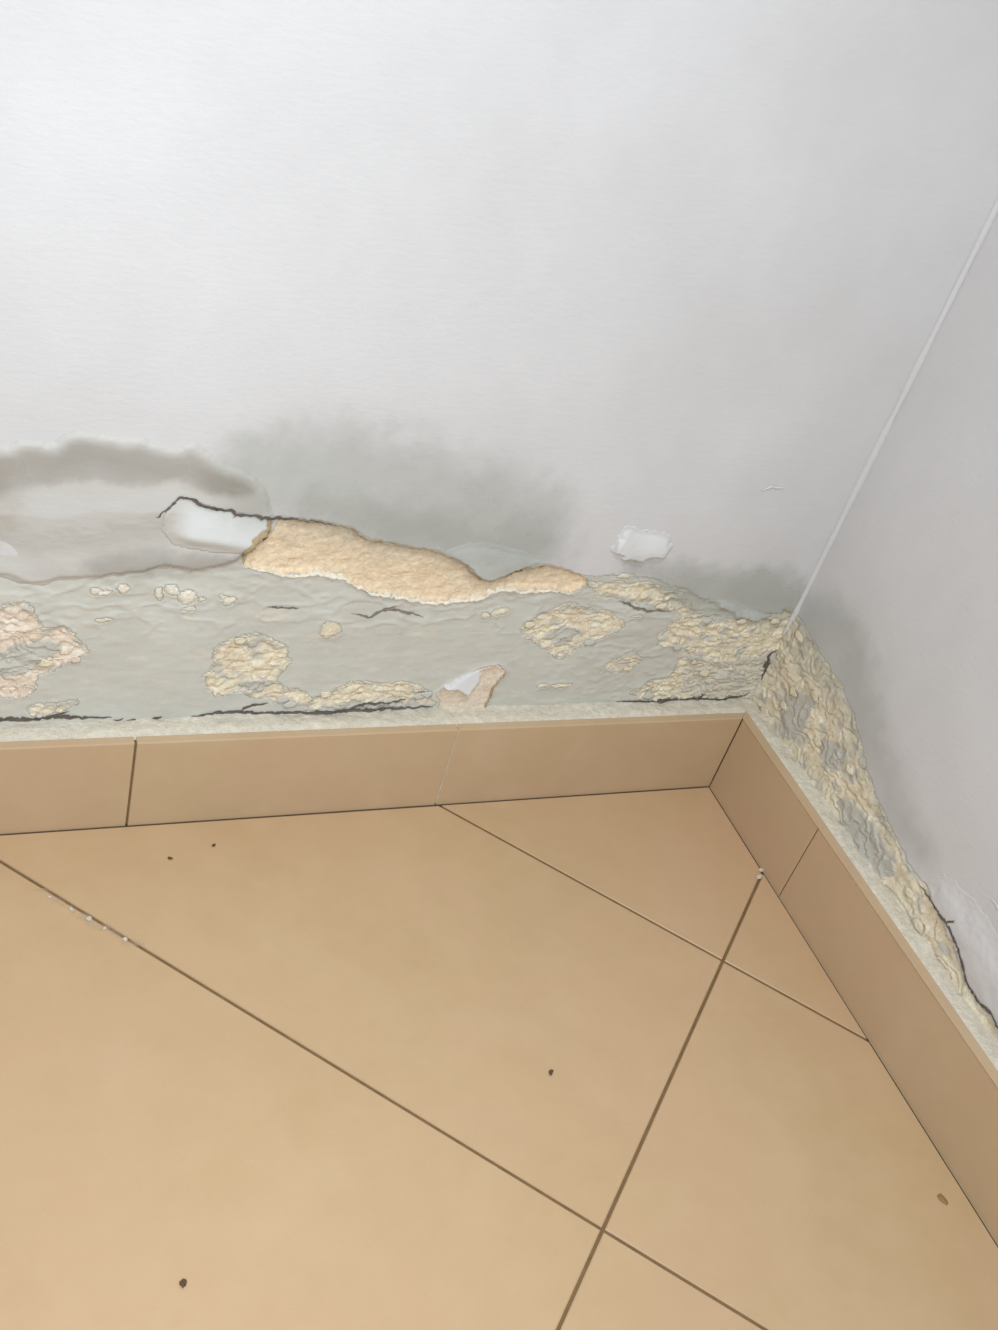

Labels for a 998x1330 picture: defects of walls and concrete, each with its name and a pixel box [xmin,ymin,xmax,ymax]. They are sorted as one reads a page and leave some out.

peeling [0,499,998,1045]